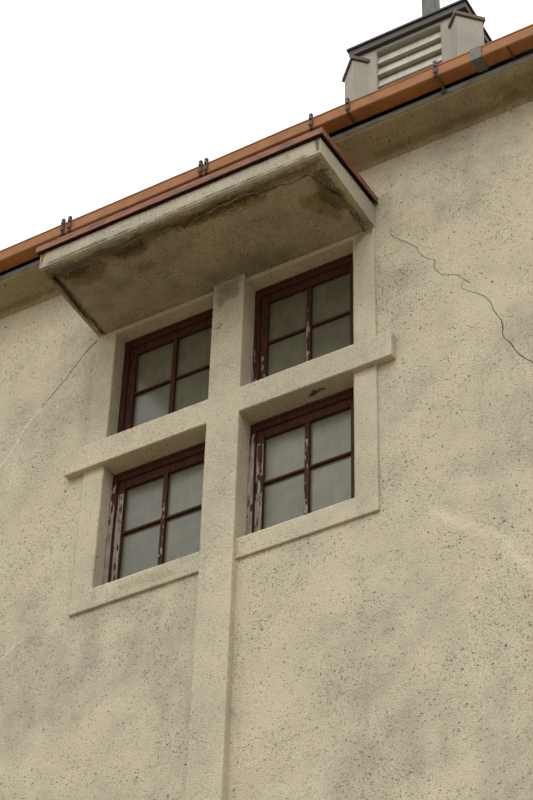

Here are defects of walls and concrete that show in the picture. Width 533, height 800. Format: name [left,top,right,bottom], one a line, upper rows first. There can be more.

crack [389,230,533,364]
peeling [102,485,124,585]
peeling [246,434,264,535]